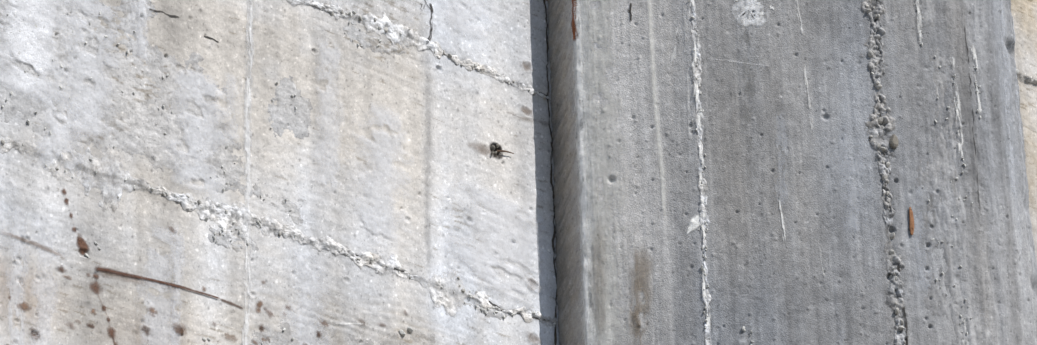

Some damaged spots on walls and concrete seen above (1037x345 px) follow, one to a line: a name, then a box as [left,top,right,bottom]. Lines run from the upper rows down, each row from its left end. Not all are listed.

water stain [574,0,620,345]